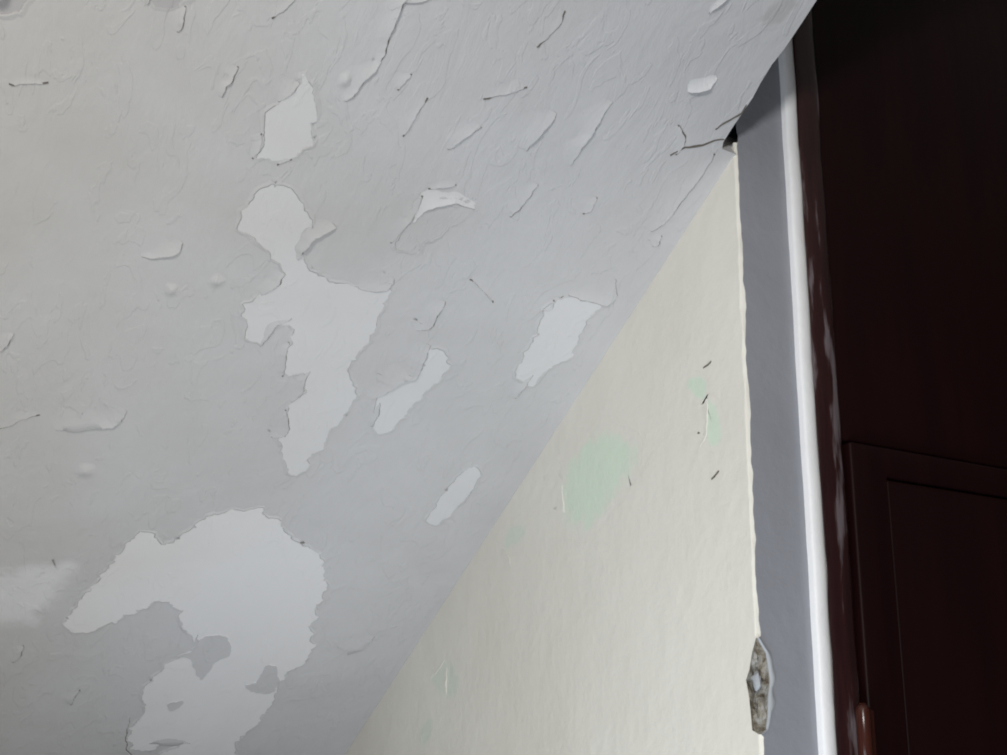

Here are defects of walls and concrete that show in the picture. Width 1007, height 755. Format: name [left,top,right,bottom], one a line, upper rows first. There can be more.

peeling [0,0,34,20]
peeling [247,70,322,166]
peeling [384,177,477,256]
peeling [234,179,456,477]
peeling [504,275,618,399]
peeling [422,464,484,527]
peeling [0,505,331,755]